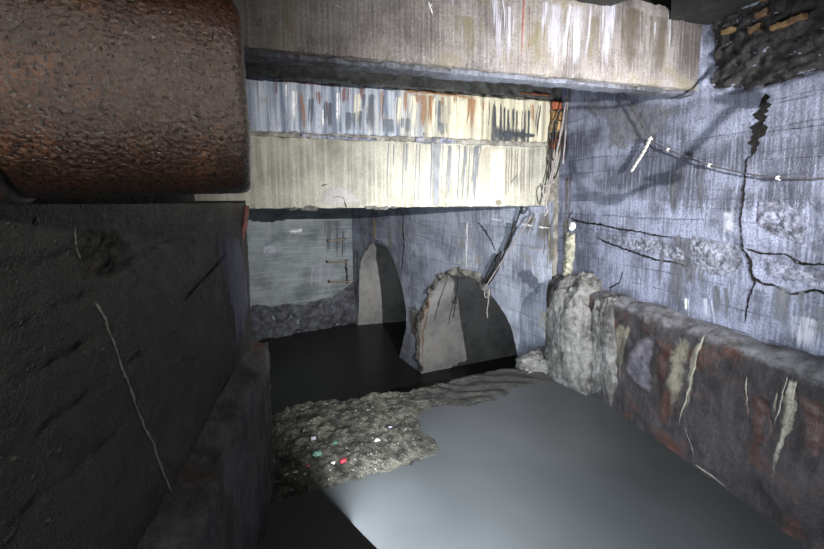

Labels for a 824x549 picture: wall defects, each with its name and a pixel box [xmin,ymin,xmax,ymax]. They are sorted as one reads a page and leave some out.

leakage [492,0,514,45]
spalling [710,0,824,89]
leakage [285,85,297,118]
leakage [308,93,416,131]
leakage [387,98,541,205]
crack [567,211,686,267]
spalling [598,235,742,276]
spalling [756,199,806,244]
crack [739,89,824,321]
spalling [415,267,492,373]